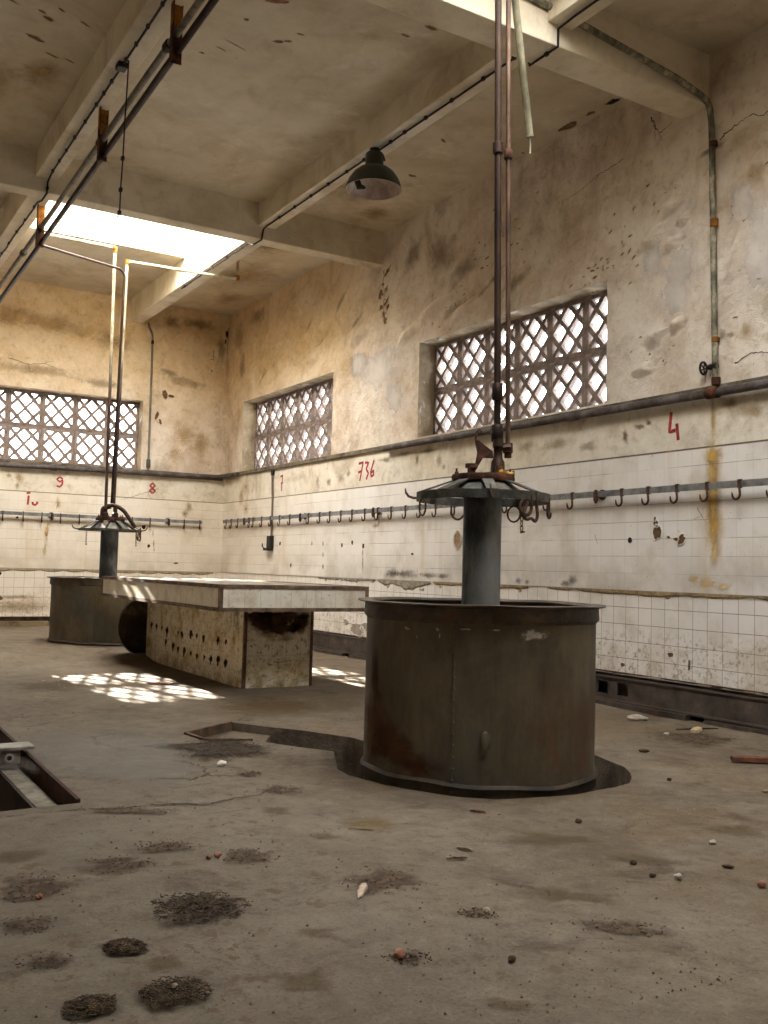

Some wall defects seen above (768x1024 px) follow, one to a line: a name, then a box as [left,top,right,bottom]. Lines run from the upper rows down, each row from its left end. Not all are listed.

rust [170,0,184,34]
crack [720,111,768,140]
rust [708,449,719,557]
spalling [652,516,687,546]
peeling [318,577,462,591]
crack [1,760,267,818]